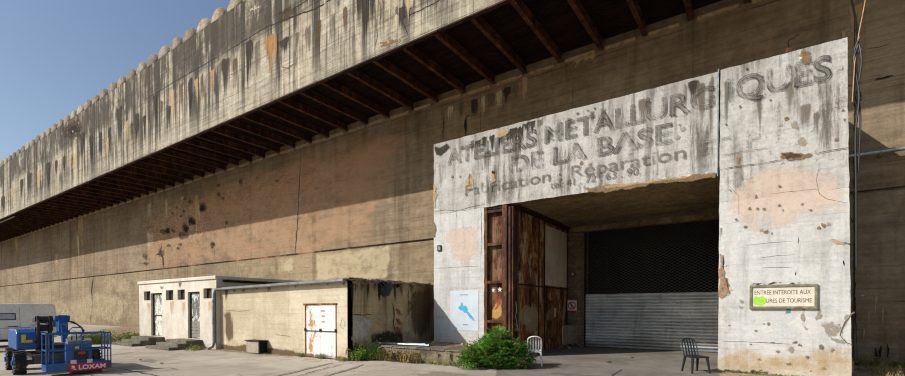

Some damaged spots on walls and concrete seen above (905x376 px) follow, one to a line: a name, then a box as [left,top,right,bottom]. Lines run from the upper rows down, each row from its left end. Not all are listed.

rust [265,34,277,62]
water stain [278,21,321,51]
water stain [332,0,377,47]
water stain [388,0,409,30]
water stain [1,40,260,211]
spalling [780,117,812,160]
water stain [786,81,819,131]
spalling [585,172,716,193]
spalling [143,198,206,265]
water stain [342,282,381,305]
water stain [394,284,433,336]
spalling [718,254,732,298]